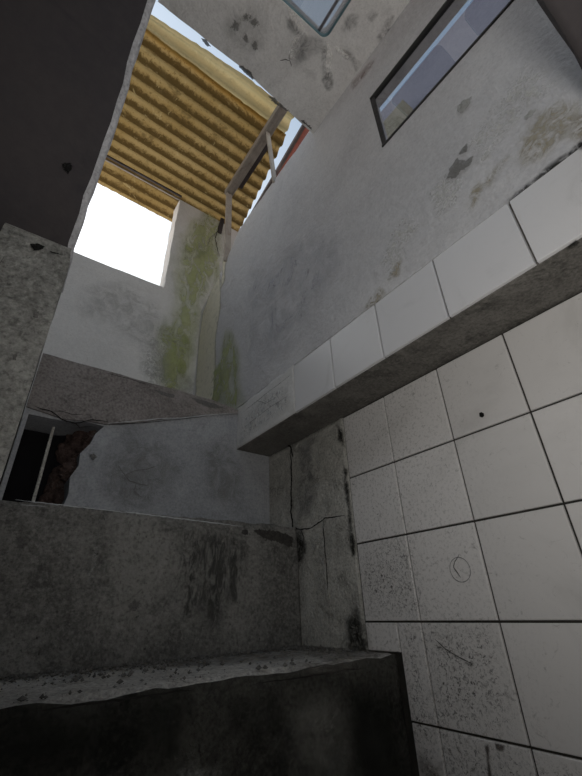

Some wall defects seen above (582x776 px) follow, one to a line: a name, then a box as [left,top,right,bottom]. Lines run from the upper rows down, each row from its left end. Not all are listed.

spalling [2,427,98,507]
leakage [184,536,237,622]